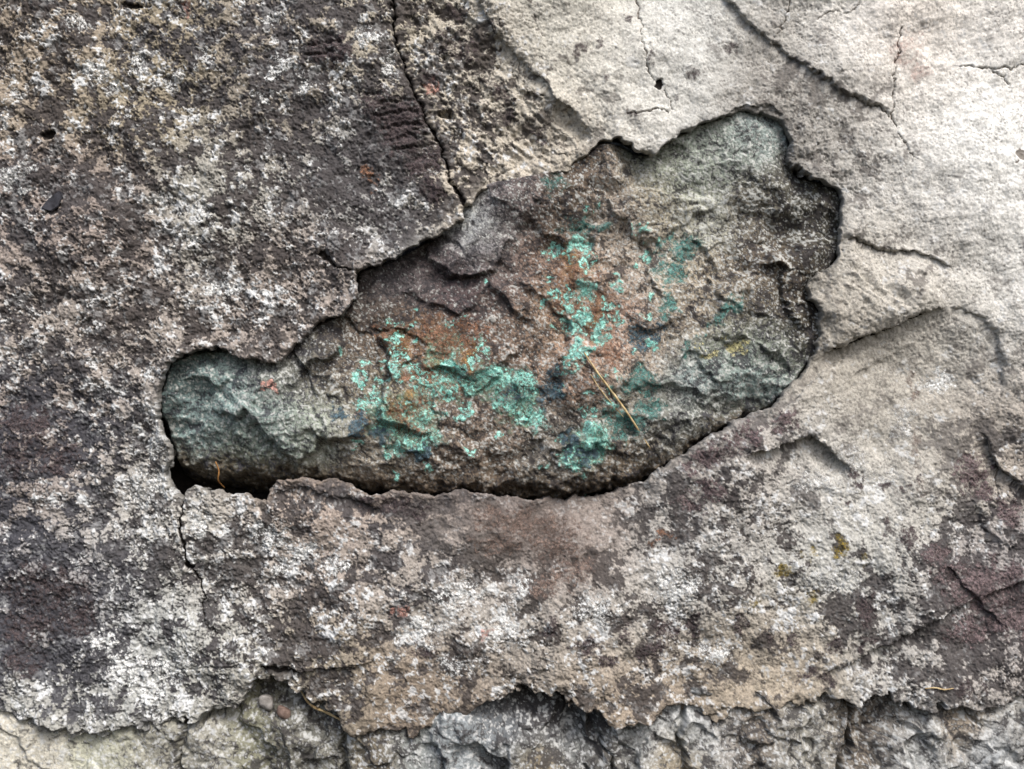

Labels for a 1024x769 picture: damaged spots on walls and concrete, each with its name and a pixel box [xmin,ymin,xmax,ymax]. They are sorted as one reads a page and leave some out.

crack [389,0,466,206]
crack [627,0,673,114]
crack [850,27,918,160]
crack [964,64,1024,85]
corrosion [371,315,490,435]
flaking render [144,0,1000,510]
corrosion [548,251,633,370]
crack [833,313,922,350]
crack [848,238,953,271]
spalling [803,685,956,714]